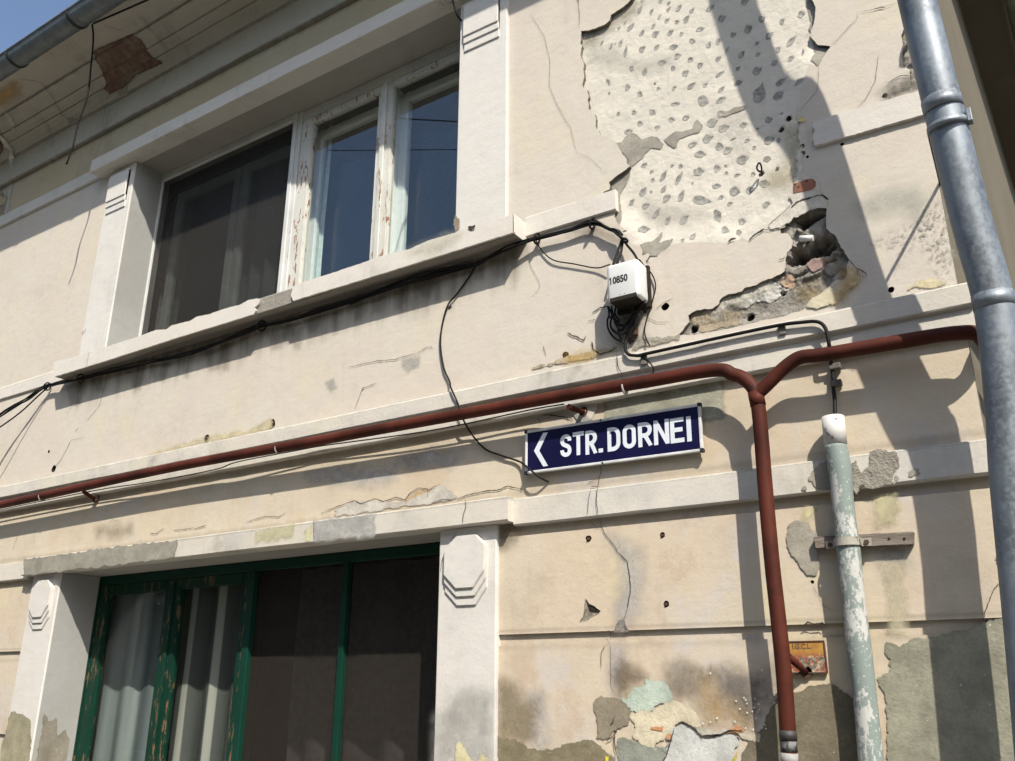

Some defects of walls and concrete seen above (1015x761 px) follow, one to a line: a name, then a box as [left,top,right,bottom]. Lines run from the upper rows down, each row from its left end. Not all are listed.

flaking render [93,34,163,94]
flaking render [582,0,861,350]
peeling [802,460,830,490]
peeling [23,540,178,575]
crack [587,465,631,692]
peeling [786,508,820,576]
peeling [0,711,70,761]
water stain [611,650,641,690]
peeling [593,678,781,761]
water stain [699,674,757,723]
peeling [794,683,858,761]
peeling [877,618,1014,761]